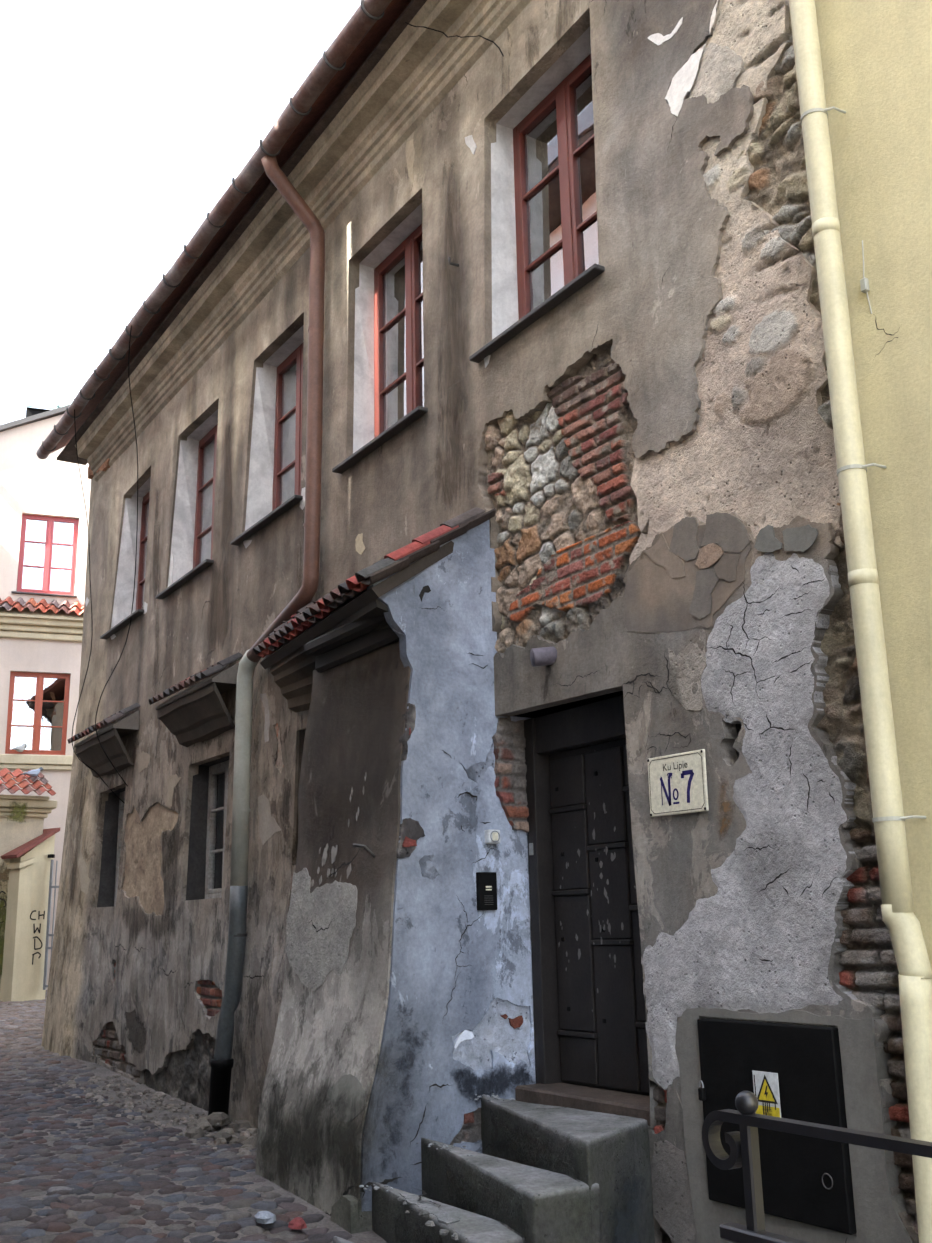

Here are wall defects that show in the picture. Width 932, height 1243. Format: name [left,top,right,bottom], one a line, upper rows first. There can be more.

crack [405,22,504,56]
spalling [485,0,911,1139]
crack [703,567,835,813]
crack [745,845,837,898]
flaking render [196,980,222,1017]
spalling [93,1022,216,1111]
water stain [377,1029,426,1106]
water stain [258,1074,400,1205]
flaking render [893,1151,918,1234]